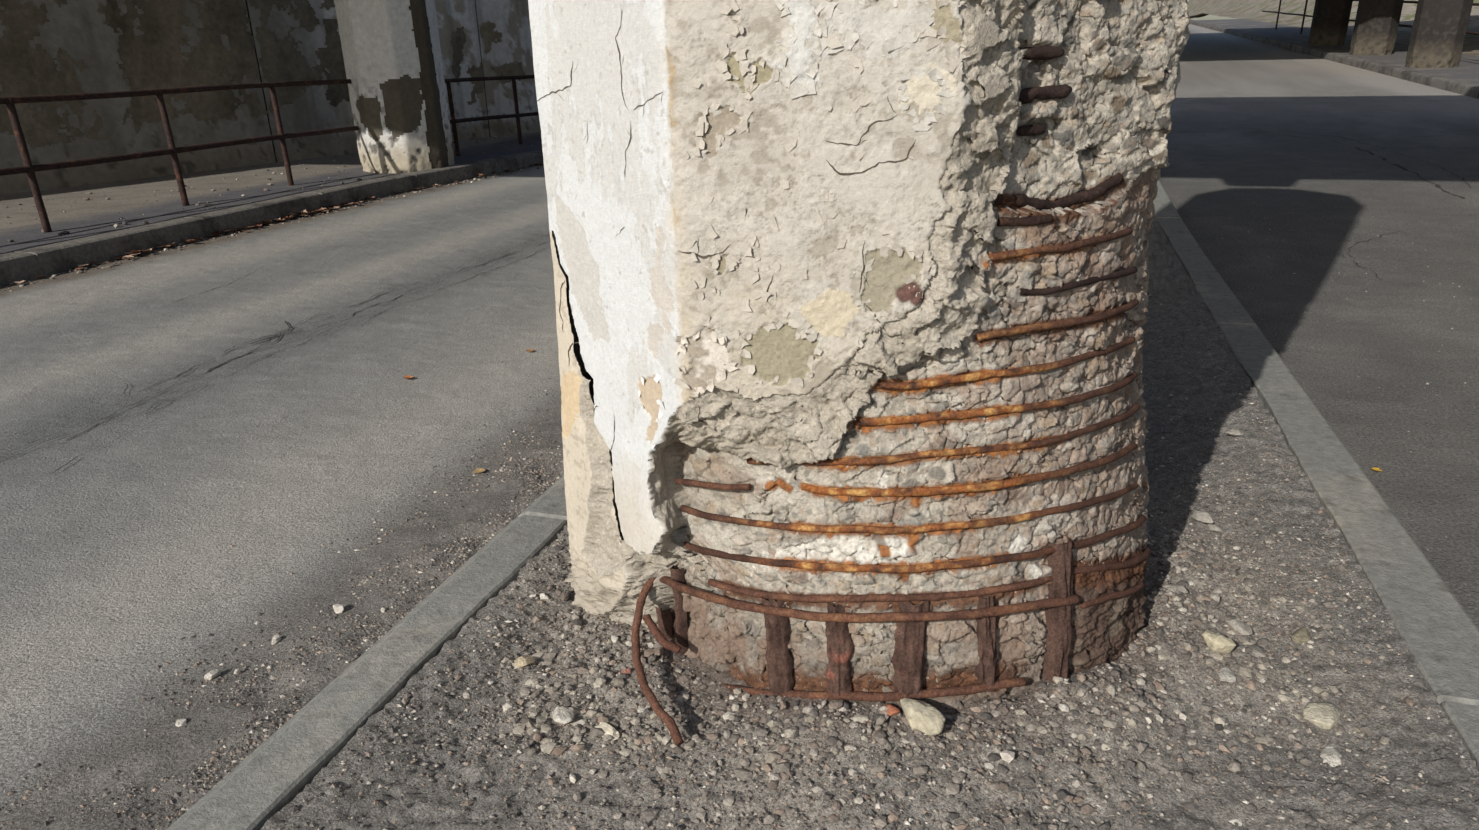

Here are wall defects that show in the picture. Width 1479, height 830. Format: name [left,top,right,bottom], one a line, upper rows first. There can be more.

peeling [0,0,525,169]
crack [538,63,577,101]
crack [615,5,662,179]
crack [826,96,916,175]
crack [559,279,579,360]
spalling [555,0,1190,709]
rust [896,282,925,305]
rust [853,404,1021,434]
rust [871,367,1014,394]
rust [975,302,1127,348]
rust [765,435,1058,507]
rust [720,518,1051,612]